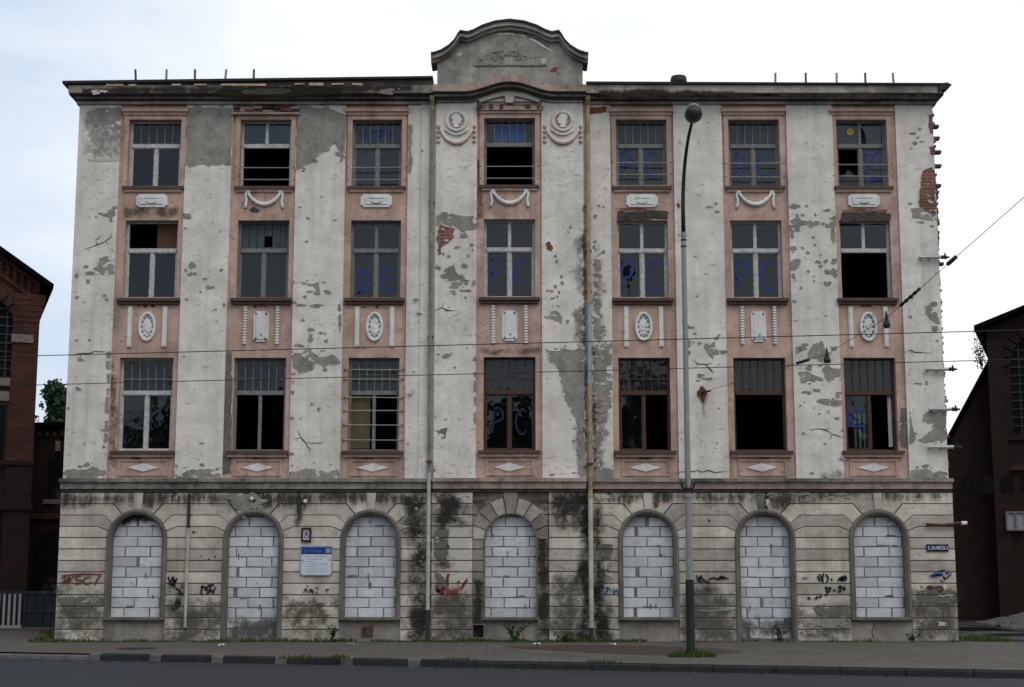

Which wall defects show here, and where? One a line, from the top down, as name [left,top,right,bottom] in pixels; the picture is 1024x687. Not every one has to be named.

flaking render [184,105,233,169]
flaking render [295,105,346,172]
flaking render [290,279,331,308]
flaking render [435,160,483,299]
flaking render [789,204,837,303]
flaking render [899,105,950,478]
flaking render [290,319,341,394]
leakage [574,229,604,474]
flaking render [795,341,844,432]
leakage [57,492,231,525]
leakage [606,492,806,508]
leakage [245,492,488,641]